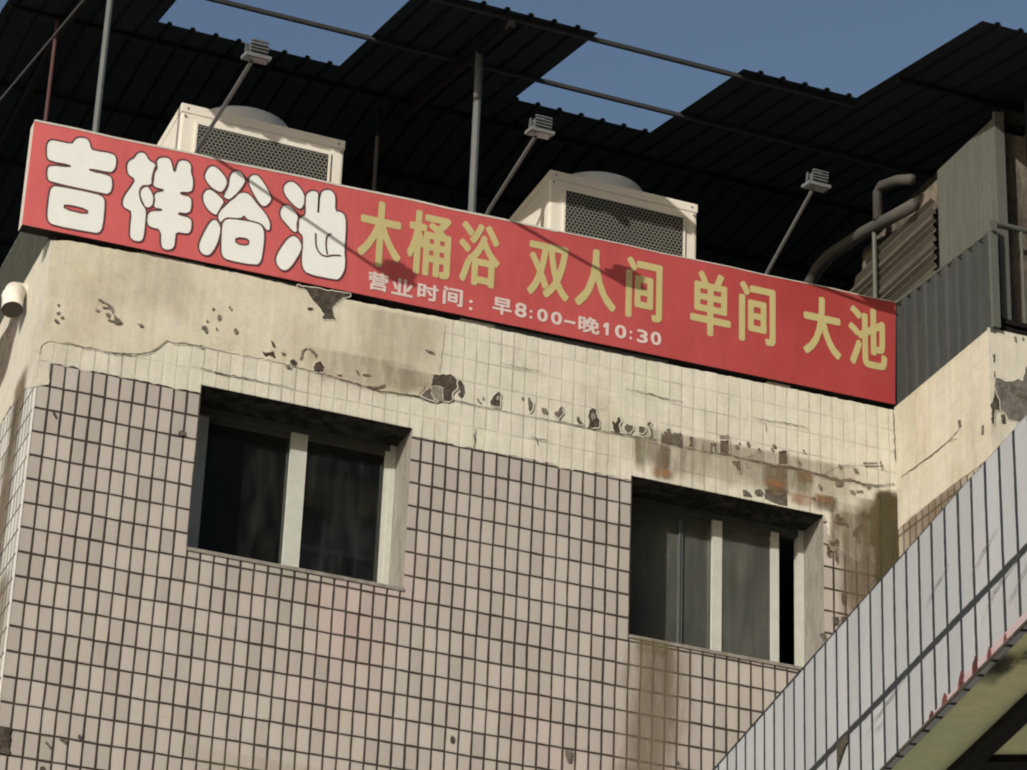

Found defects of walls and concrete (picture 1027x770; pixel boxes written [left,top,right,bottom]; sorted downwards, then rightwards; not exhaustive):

peeling [95,299,122,324]
spalling [0,316,20,387]
spalling [263,341,342,376]
spalling [421,373,464,403]
spalling [477,391,502,408]
crack [66,340,962,486]
spalling [522,396,805,473]
spalling [981,354,1027,435]